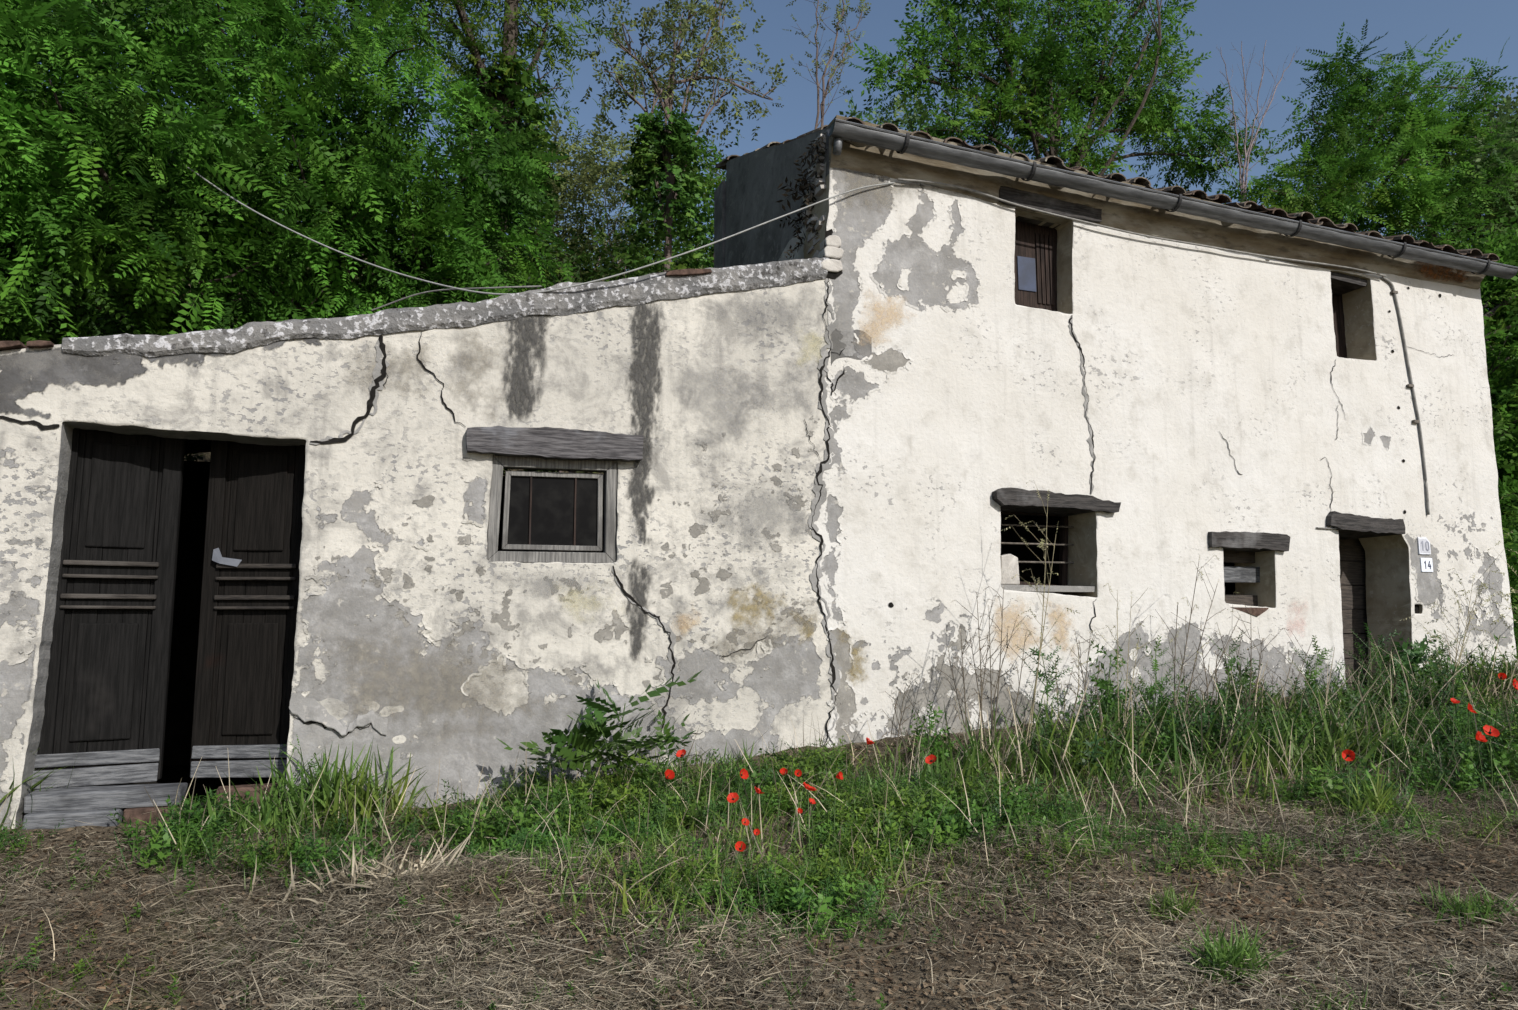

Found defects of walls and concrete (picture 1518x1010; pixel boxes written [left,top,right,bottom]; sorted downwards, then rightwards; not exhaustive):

peeling [0,523,44,830]
crack [310,331,464,445]
water stain [503,315,548,418]
water stain [626,561,650,659]
water stain [629,304,662,544]
crack [612,566,703,758]
peeling [291,134,1344,808]
crack [804,278,845,746]
crack [1068,315,1096,495]
peeling [1405,512,1515,655]